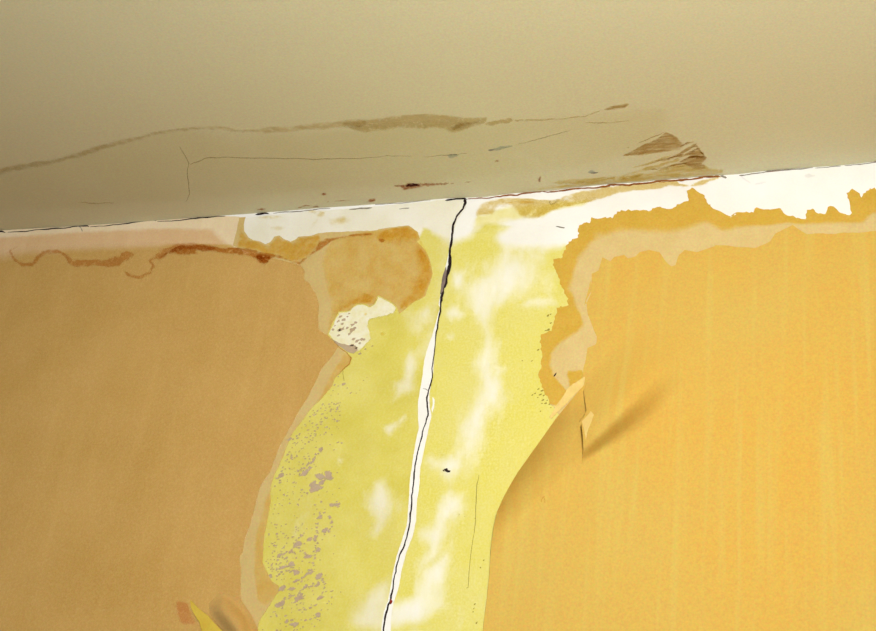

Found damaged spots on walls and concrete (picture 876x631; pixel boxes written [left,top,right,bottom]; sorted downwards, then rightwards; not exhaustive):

crack [0,216,224,233]
flaking render [244,162,876,631]
crack [255,162,876,631]